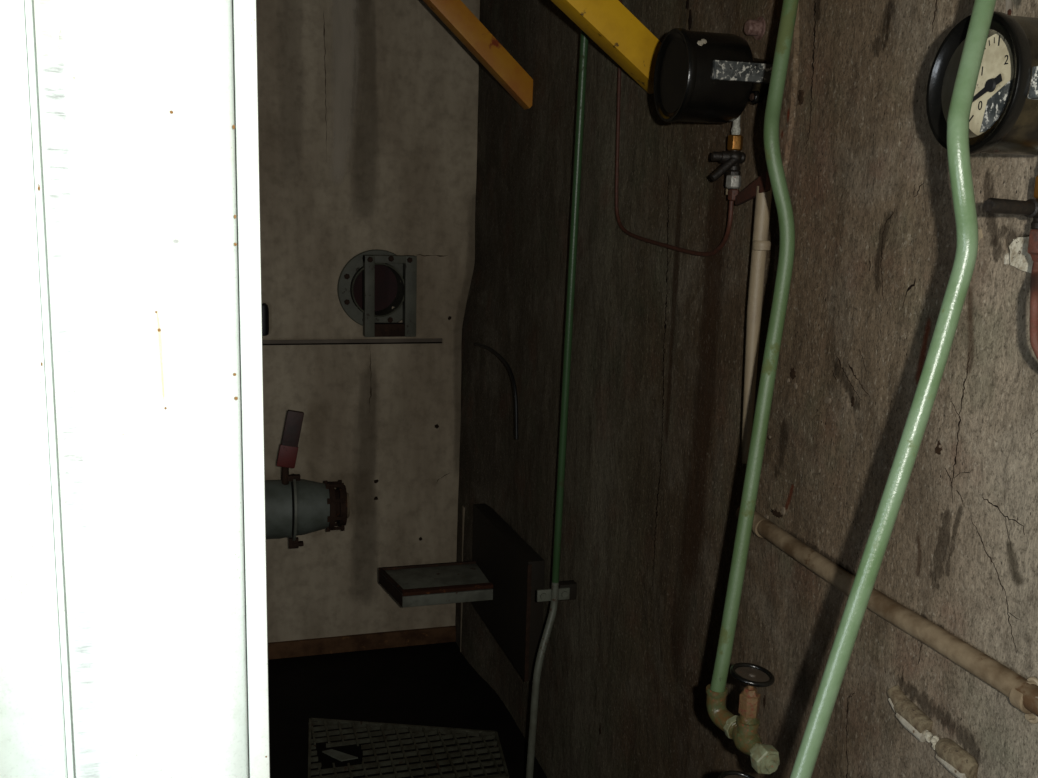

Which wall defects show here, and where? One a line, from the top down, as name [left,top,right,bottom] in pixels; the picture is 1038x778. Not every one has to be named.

crack [945,354,1025,653]